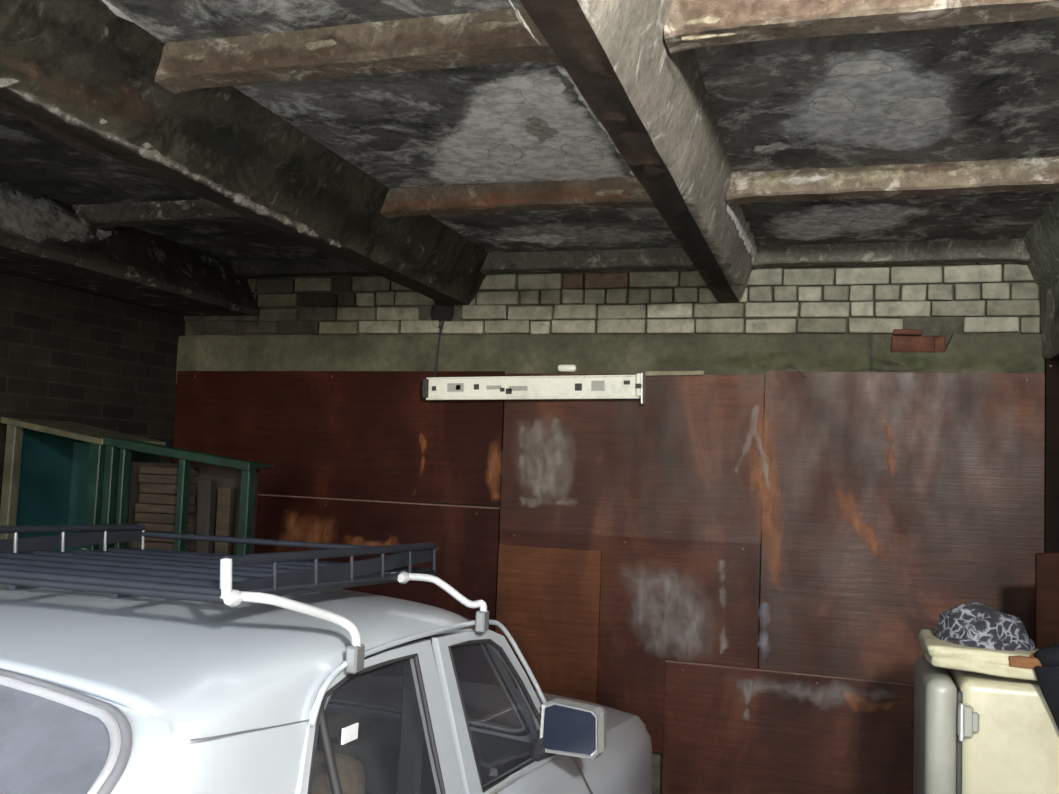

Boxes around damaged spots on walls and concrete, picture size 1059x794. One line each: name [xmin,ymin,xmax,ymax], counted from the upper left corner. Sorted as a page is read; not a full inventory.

damp [753,50,953,152]
damp [751,158,1059,191]
flaking render [0,190,112,241]